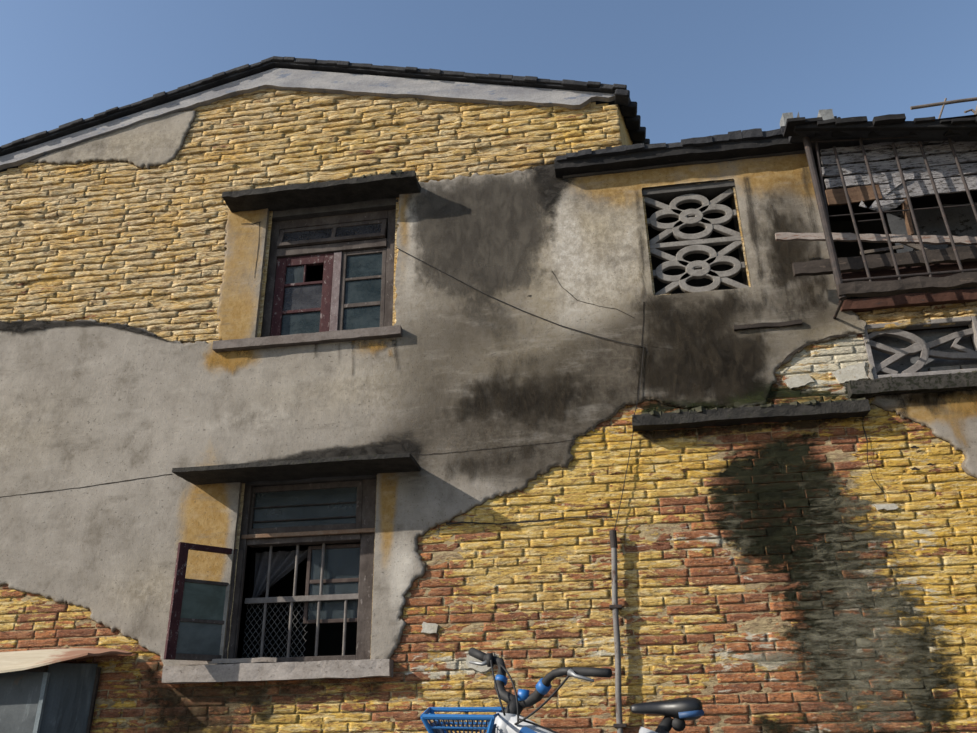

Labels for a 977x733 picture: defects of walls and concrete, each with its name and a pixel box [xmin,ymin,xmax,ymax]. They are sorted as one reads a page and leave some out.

flaking render [0,88,622,344]
water stain [527,160,574,214]
water stain [744,178,826,312]
water stain [460,374,591,425]
water stain [638,290,765,405]
flaking render [756,301,977,406]
flaking render [0,397,977,733]
crack [446,516,613,525]
water stain [639,414,958,733]